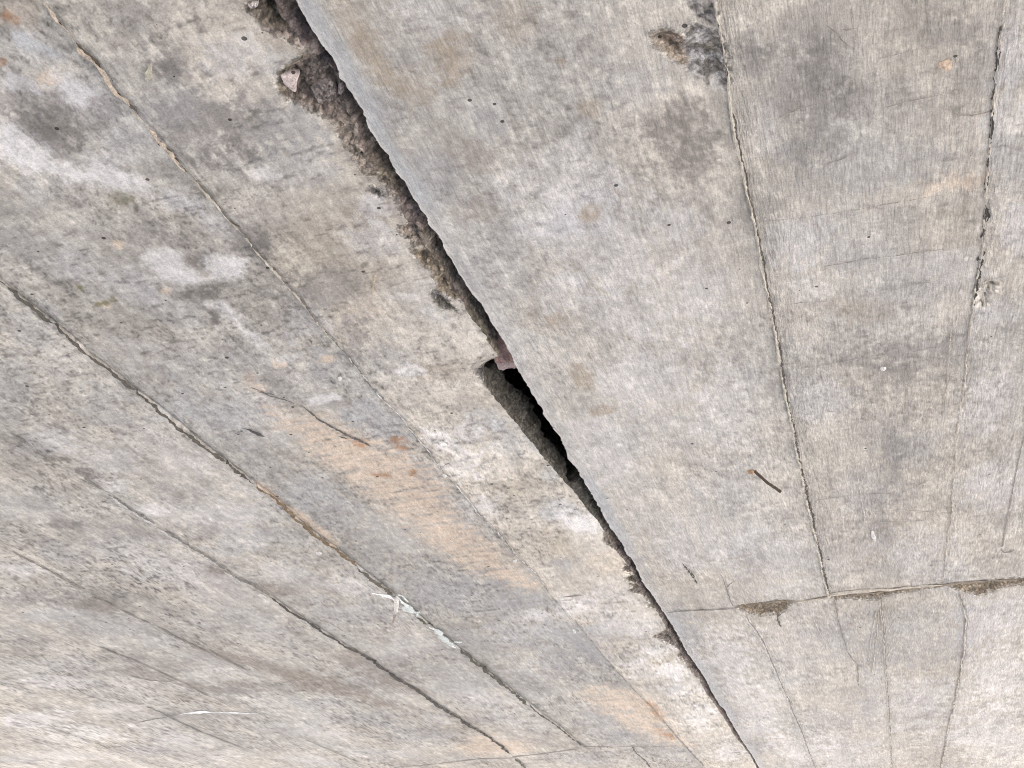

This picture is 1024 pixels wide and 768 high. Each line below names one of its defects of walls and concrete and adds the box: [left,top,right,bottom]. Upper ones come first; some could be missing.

crack [160,141,264,259]
crack [0,278,734,768]
crack [668,19,1024,768]